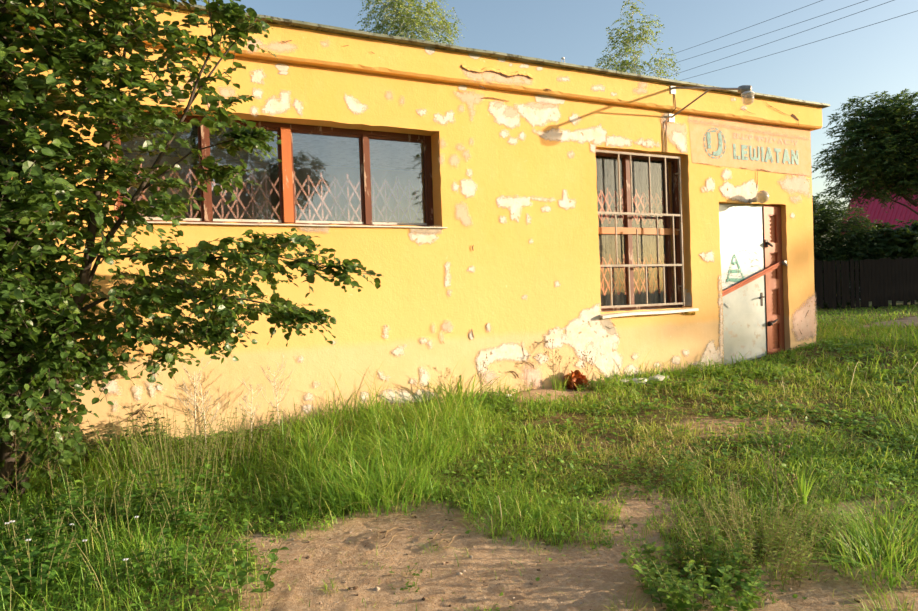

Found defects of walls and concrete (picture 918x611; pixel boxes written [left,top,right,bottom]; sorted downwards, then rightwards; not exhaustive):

peeling [247,39,296,52]
peeling [250,63,304,115]
peeling [344,95,368,115]
peeling [416,54,687,158]
peeling [440,139,478,226]
peeling [496,190,576,224]
peeling [701,168,758,203]
peeling [780,175,812,218]
peeling [409,232,439,246]
peeling [475,303,645,387]
peeling [672,275,724,371]
peeling [792,296,817,341]